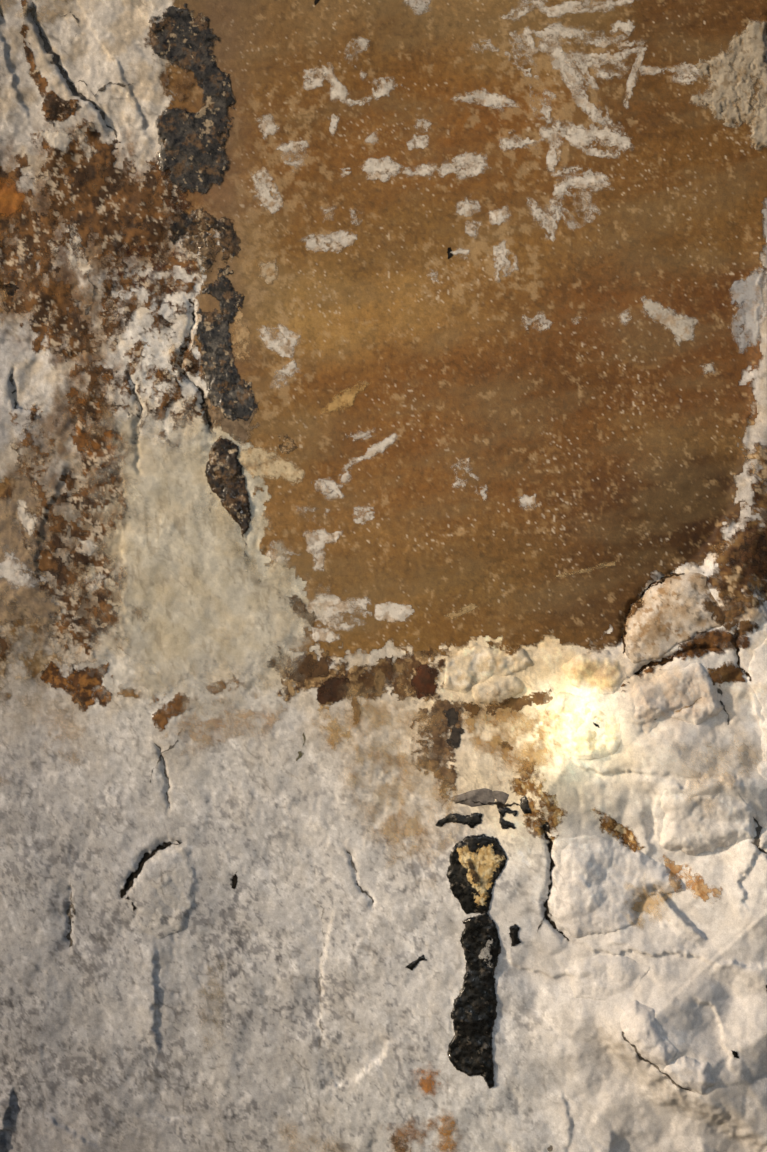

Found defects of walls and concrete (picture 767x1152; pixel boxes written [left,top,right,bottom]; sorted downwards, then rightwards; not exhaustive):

spalling [303,65,395,106]
spalling [474,0,767,241]
spalling [341,152,487,182]
spalling [641,299,697,345]
rust [0,0,767,840]
spalling [49,417,415,708]
rust [592,809,644,852]
crack [752,817,767,854]
crack [120,840,181,911]
damp [465,859,481,894]
rust [632,855,722,925]
crack [622,1031,693,1092]